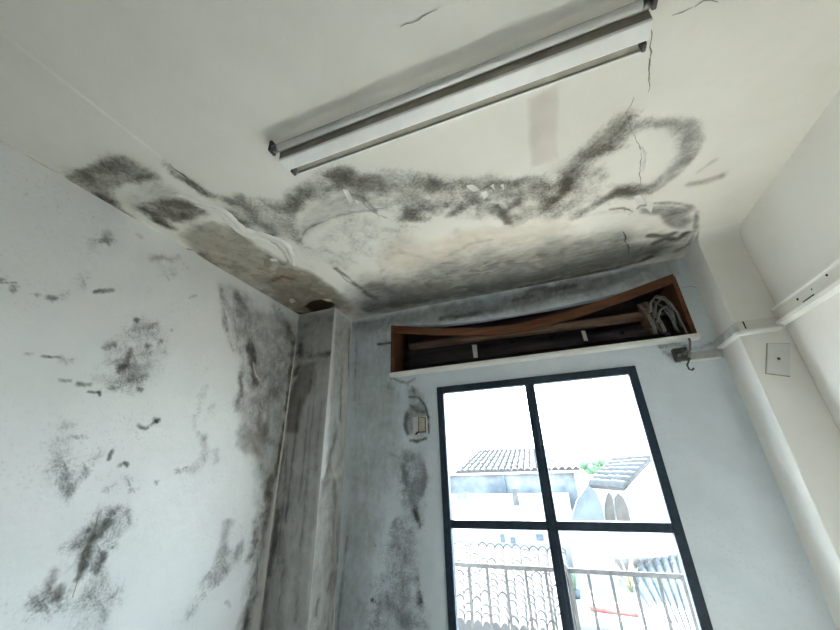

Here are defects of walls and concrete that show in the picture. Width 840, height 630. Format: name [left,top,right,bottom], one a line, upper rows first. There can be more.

crack [625,29,653,191]
damp [71,157,155,206]
damp [138,199,205,229]
peeling [176,194,315,271]
damp [283,183,316,212]
damp [324,168,384,191]
damp [187,196,690,315]
damp [412,177,467,192]
damp [532,115,638,214]
spalling [289,298,335,314]
damp [265,424,284,497]
damp [77,511,115,580]